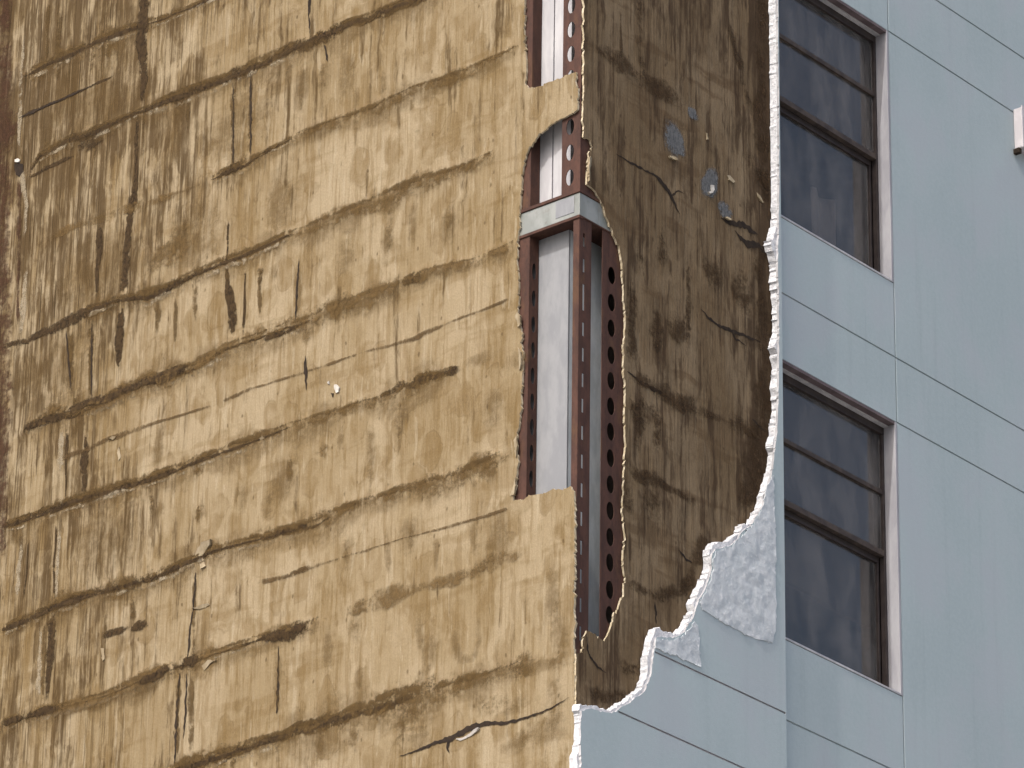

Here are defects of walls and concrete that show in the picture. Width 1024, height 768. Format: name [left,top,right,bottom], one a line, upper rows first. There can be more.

peeling [665,124,684,160]
damp [4,0,513,430]
crack [618,155,685,214]
peeling [701,168,735,221]
crack [722,218,767,259]
crack [702,310,760,346]
damp [3,366,458,527]
damp [2,451,517,726]
peeling [700,475,777,643]
peeling [655,621,701,667]
damp [170,655,531,768]
crack [400,697,569,756]